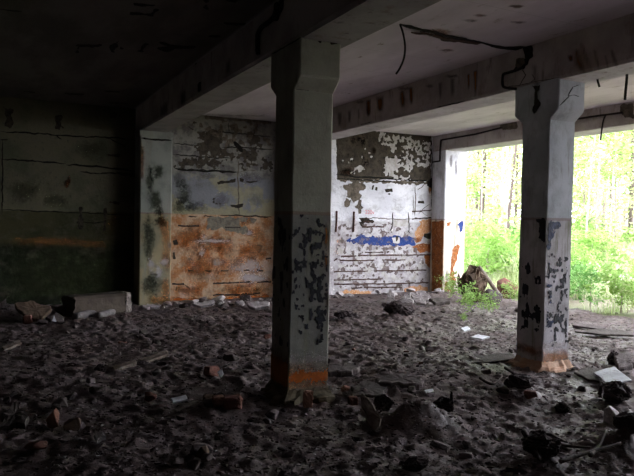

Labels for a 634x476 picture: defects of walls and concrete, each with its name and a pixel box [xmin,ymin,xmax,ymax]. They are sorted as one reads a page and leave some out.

crack [401,24,527,50]
spalling [532,85,541,113]
flaking render [173,121,273,185]
leakage [143,166,168,297]
corrosion [181,229,264,280]
flaking render [213,131,464,374]
corrosion [151,280,200,303]
peeling [494,218,606,370]
corrosion [271,349,328,389]
corrosion [516,344,568,362]